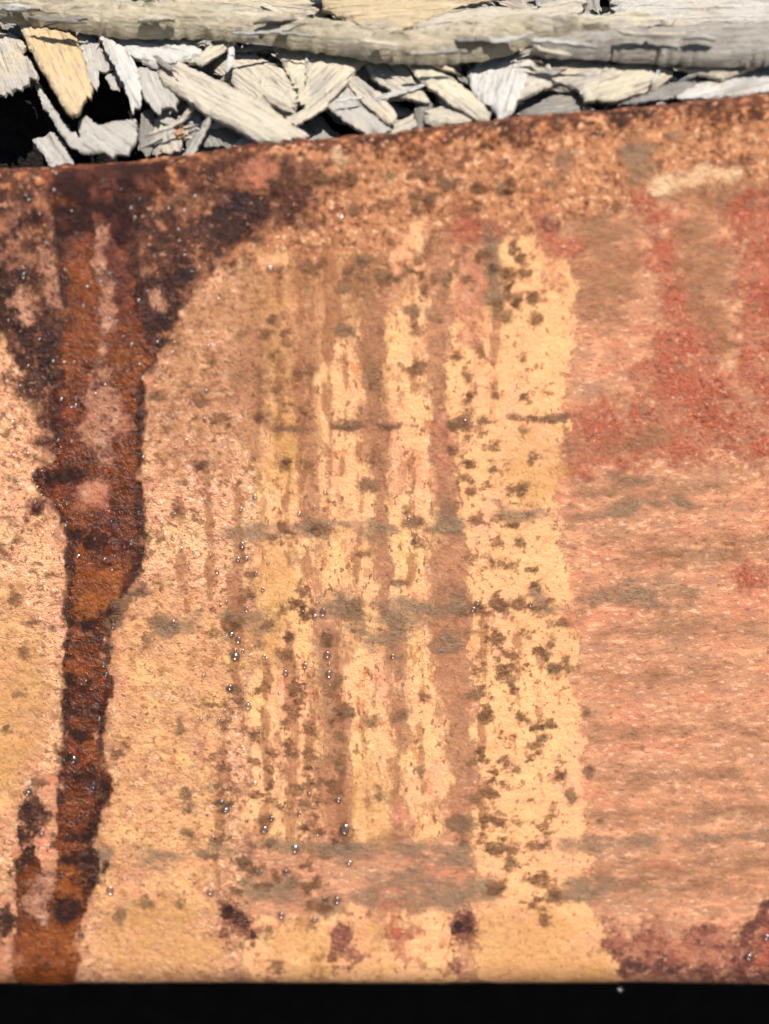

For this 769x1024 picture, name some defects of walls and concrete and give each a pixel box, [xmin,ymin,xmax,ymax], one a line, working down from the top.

damp [274,424,309,432]
damp [331,419,415,431]
damp [447,415,495,430]
damp [508,413,569,424]
damp [226,520,352,539]
damp [495,509,541,523]
damp [325,587,563,647]
damp [436,802,611,865]
corrosion [18,867,58,929]
damp [266,837,500,909]
damp [531,870,617,903]
corrosion [0,902,16,938]